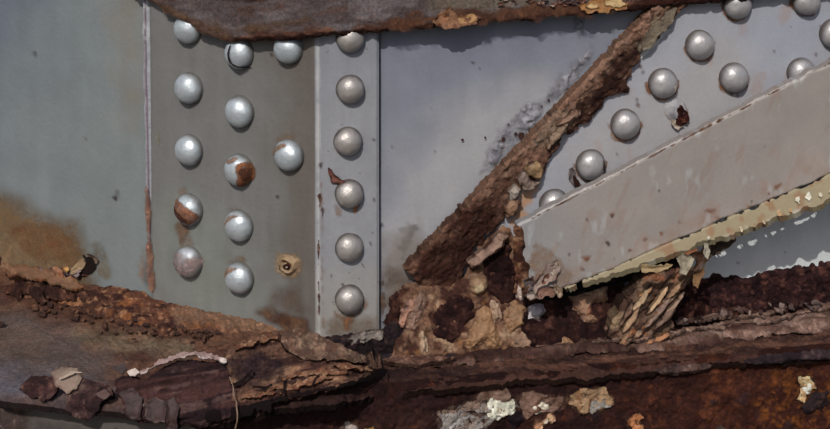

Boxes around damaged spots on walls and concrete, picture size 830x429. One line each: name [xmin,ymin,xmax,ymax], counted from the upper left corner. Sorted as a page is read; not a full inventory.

peeling [432,6,481,30]
rust [451,0,586,25]
rust [226,157,255,187]
rust [328,167,346,185]
peeling [777,190,830,217]
peeling [640,227,743,289]
rust [0,187,830,429]
peeling [437,386,615,429]